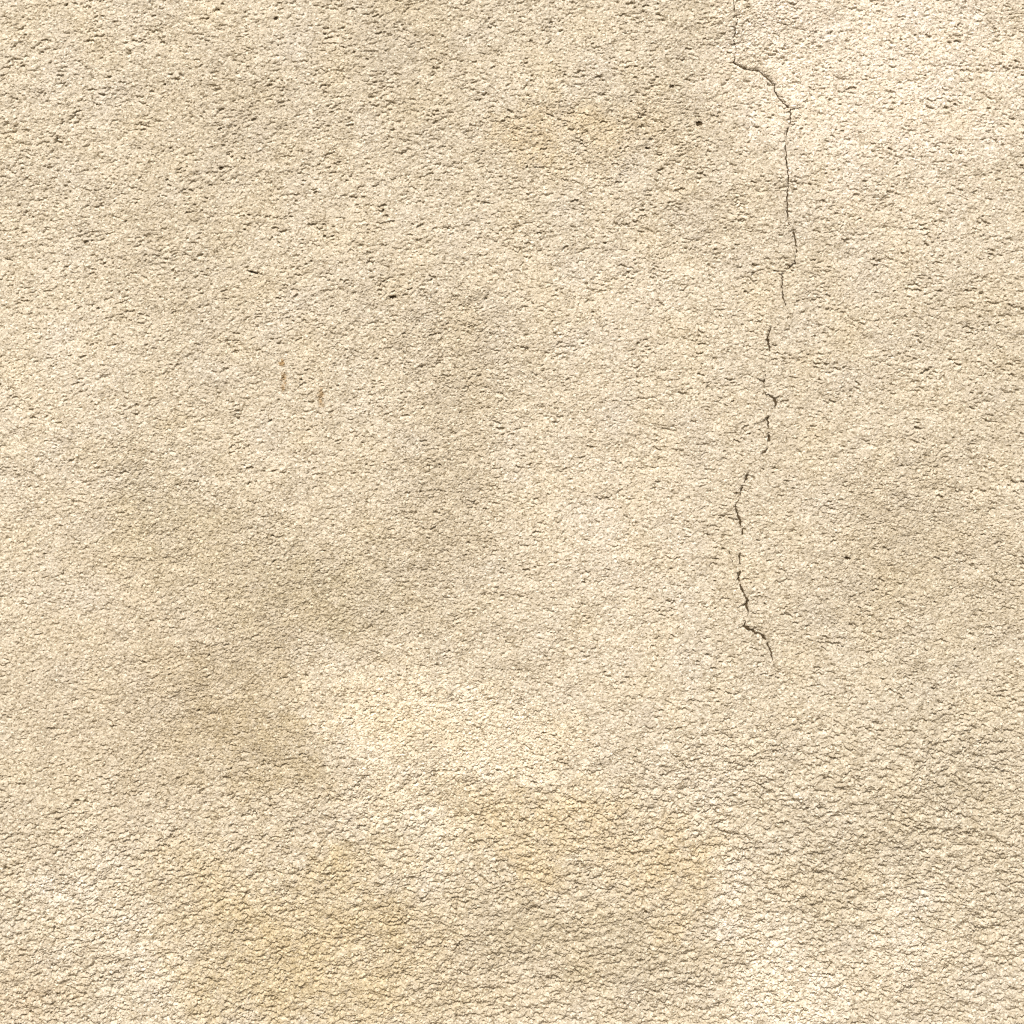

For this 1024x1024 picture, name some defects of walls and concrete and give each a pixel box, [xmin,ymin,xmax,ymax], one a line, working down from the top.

crack [717,0,800,305]
crack [717,328,777,675]